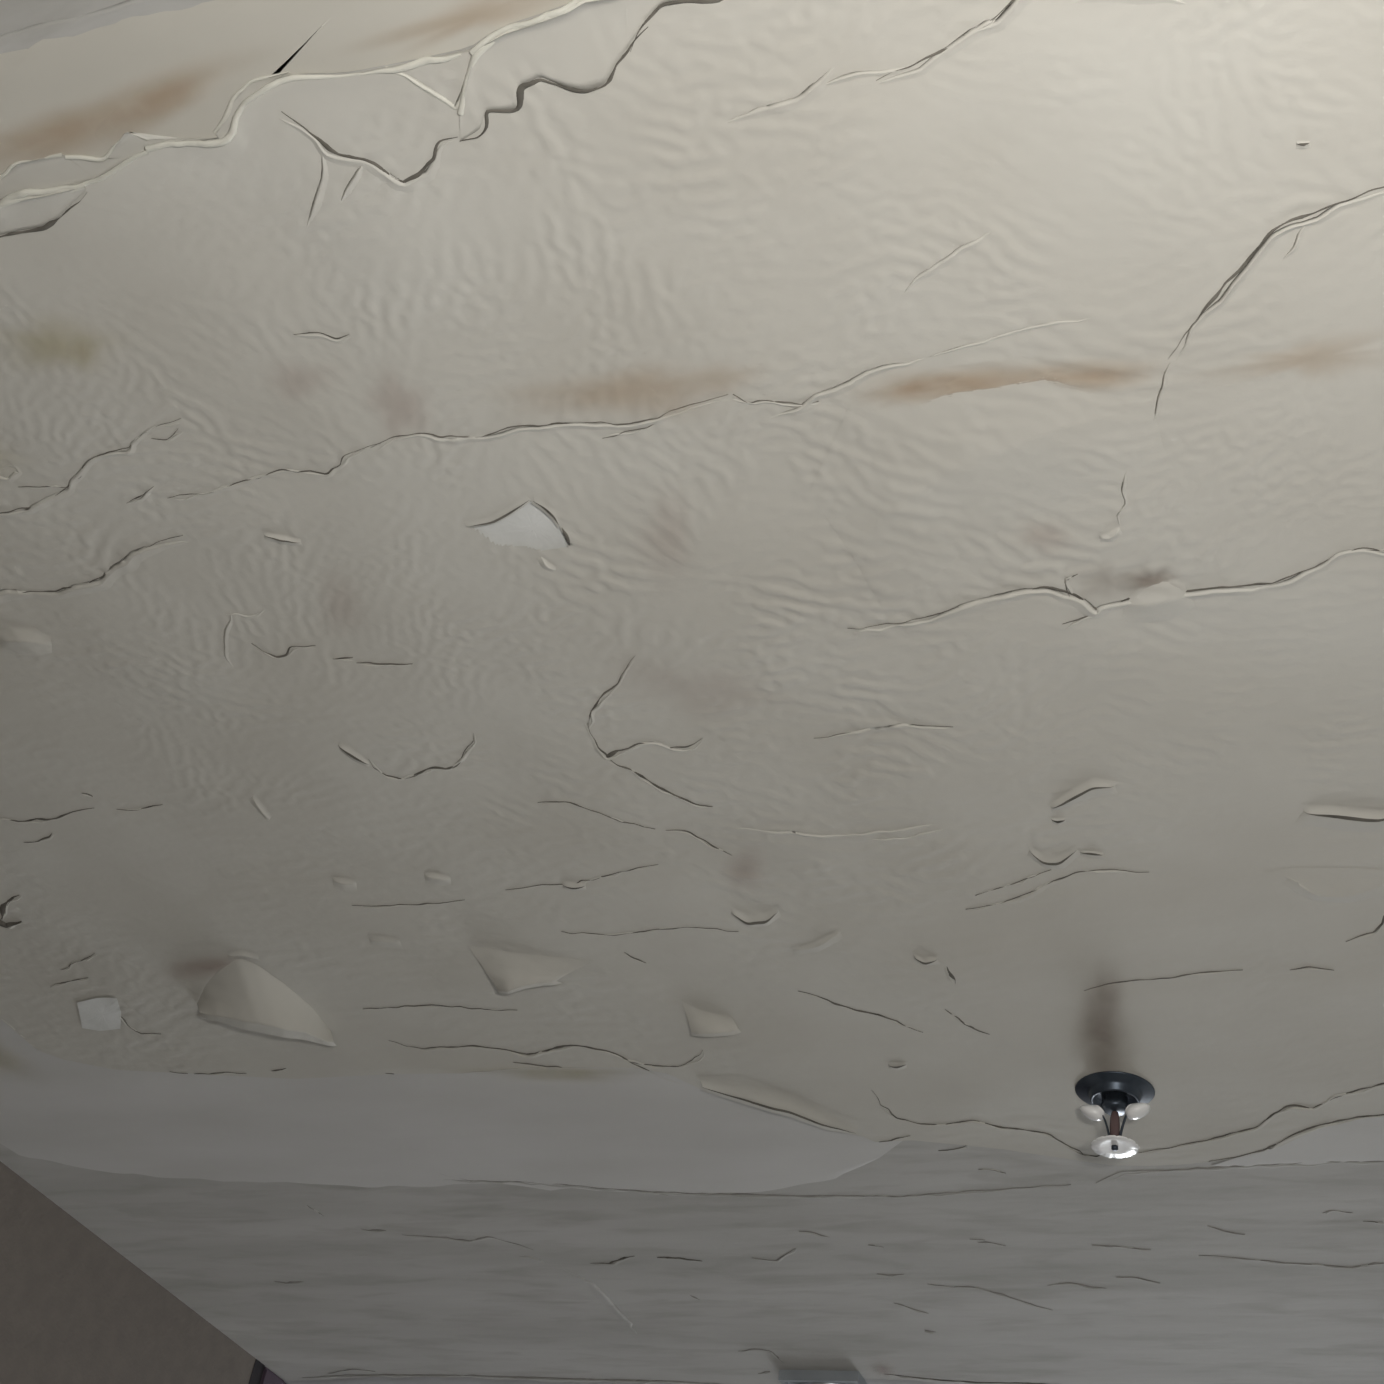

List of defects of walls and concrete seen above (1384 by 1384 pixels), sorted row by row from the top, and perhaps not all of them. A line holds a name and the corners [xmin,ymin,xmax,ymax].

peeling [145,0,584,153]
peeling [457,0,648,141]
peeling [635,0,723,39]
peeling [0,184,86,238]
peeling [0,150,150,202]
crack [1153,187,1384,421]
crack [126,314,1097,504]
spalling [463,494,572,551]
crack [847,574,1133,633]
crack [1182,547,1384,600]
crack [538,656,951,856]
crack [446,1083,1384,1262]